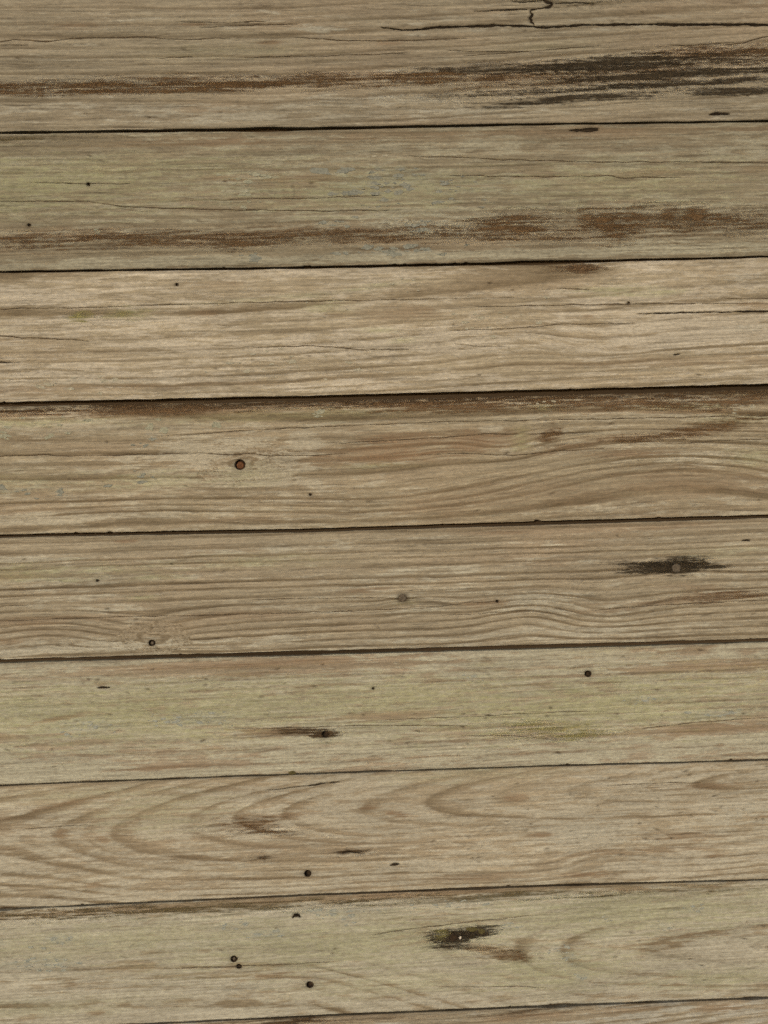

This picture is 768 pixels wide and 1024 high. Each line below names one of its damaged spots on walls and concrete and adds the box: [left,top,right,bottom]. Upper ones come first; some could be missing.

crack [0,0,768,58]
peeling [318,155,447,258]